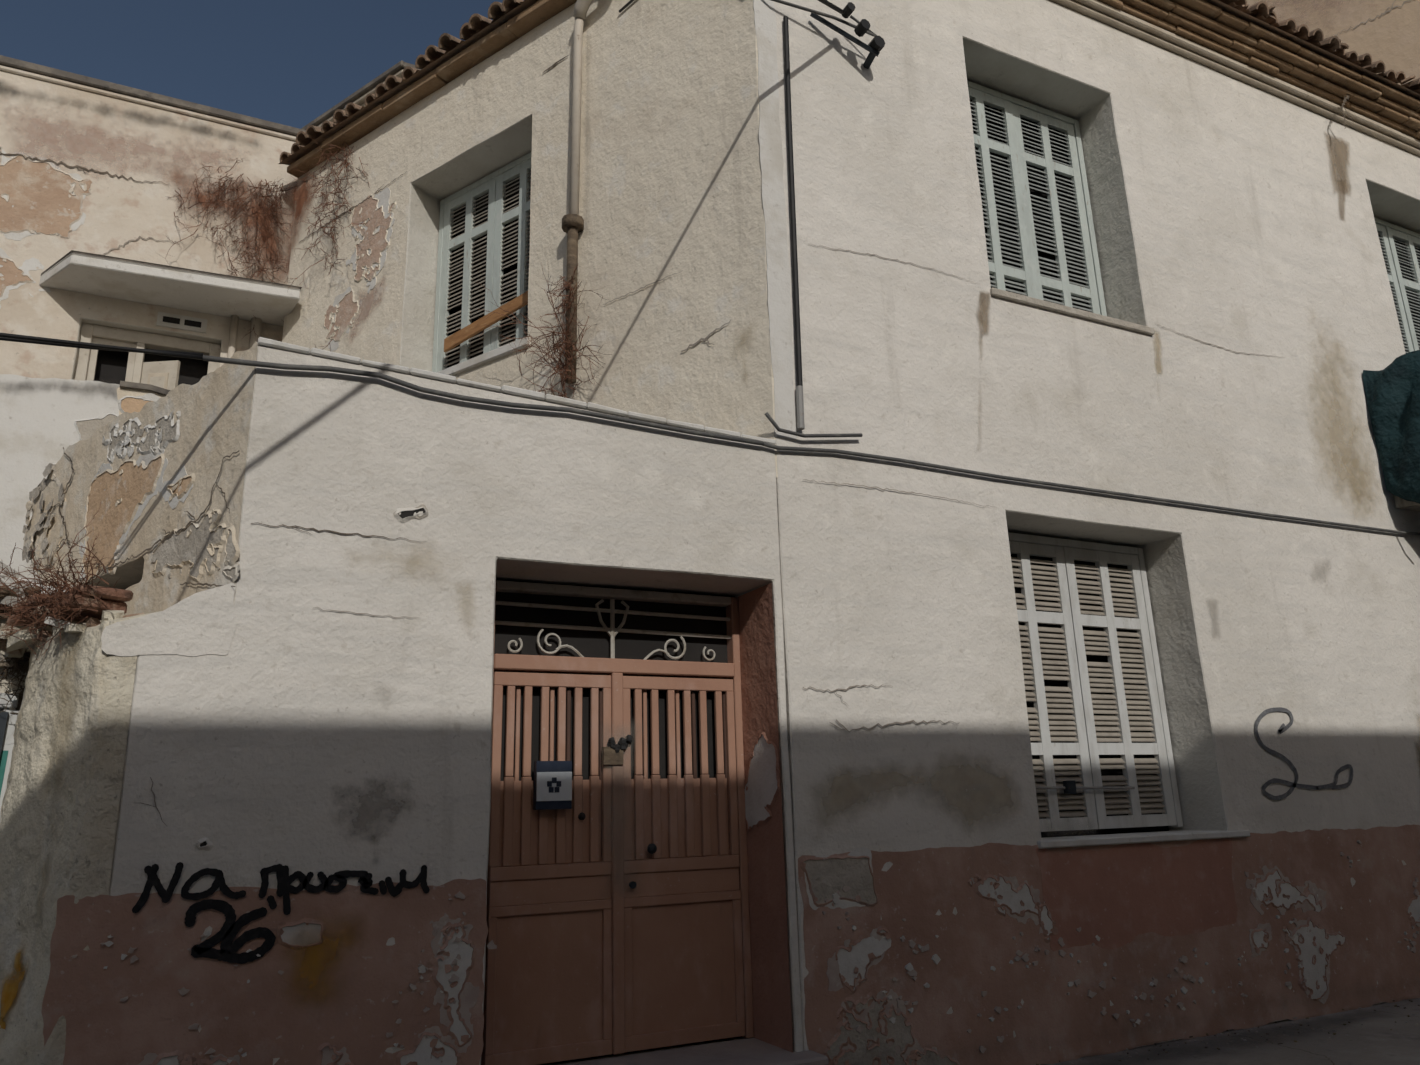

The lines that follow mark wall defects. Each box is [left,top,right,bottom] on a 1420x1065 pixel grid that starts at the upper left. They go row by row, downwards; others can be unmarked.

peeling [0,145,92,309]
peeling [324,187,397,351]
peeling [22,463,67,574]
peeling [73,393,196,582]
peeling [151,508,240,582]
crack [180,582,235,591]
crack [45,447,427,584]
peeling [744,732,780,832]
peeling [386,891,497,1065]
peeling [800,847,941,1024]
peeling [968,873,1215,1027]
peeling [1237,865,1346,1004]